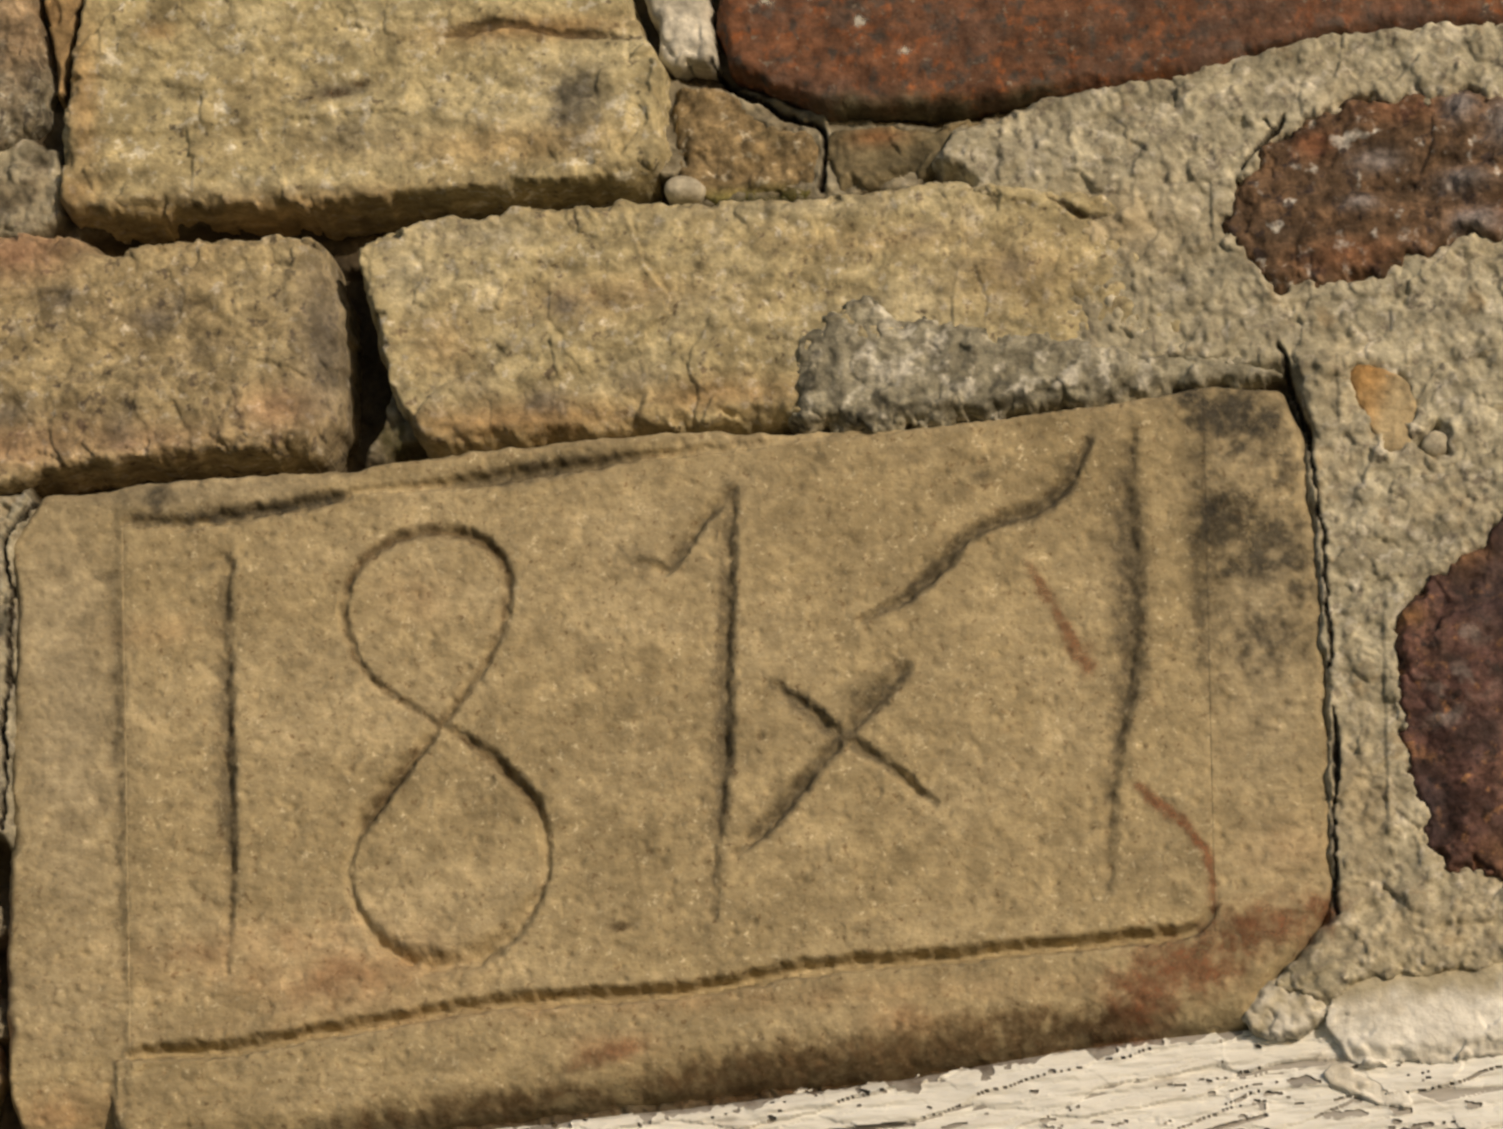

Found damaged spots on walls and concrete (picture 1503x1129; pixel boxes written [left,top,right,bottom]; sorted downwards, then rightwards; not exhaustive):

crack [1277,345,1333,667]
crack [1332,706,1340,915]
peeling [500,962,1503,1129]